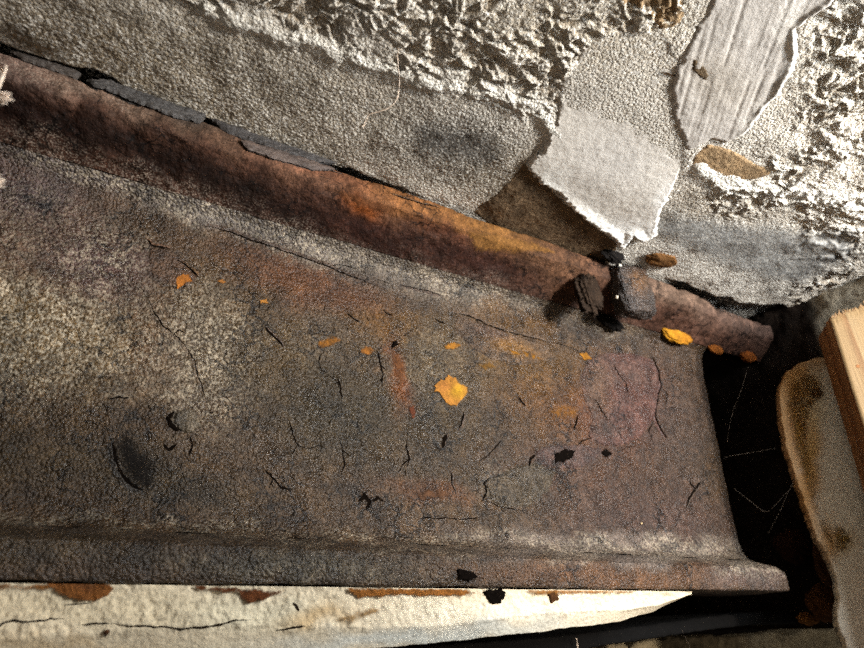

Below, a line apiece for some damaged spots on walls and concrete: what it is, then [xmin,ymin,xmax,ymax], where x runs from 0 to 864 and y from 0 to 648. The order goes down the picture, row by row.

spalling [622,0,684,31]
spalling [693,60,709,80]
corrosion [11,51,336,171]
flaking render [473,78,772,264]
crack [200,223,581,353]
corrosion [573,273,625,332]
crack [144,293,214,414]
corrosion [435,375,468,406]
crack [164,411,193,455]
corrosion [0,584,114,602]
crack [0,603,240,631]
crack [275,603,304,631]